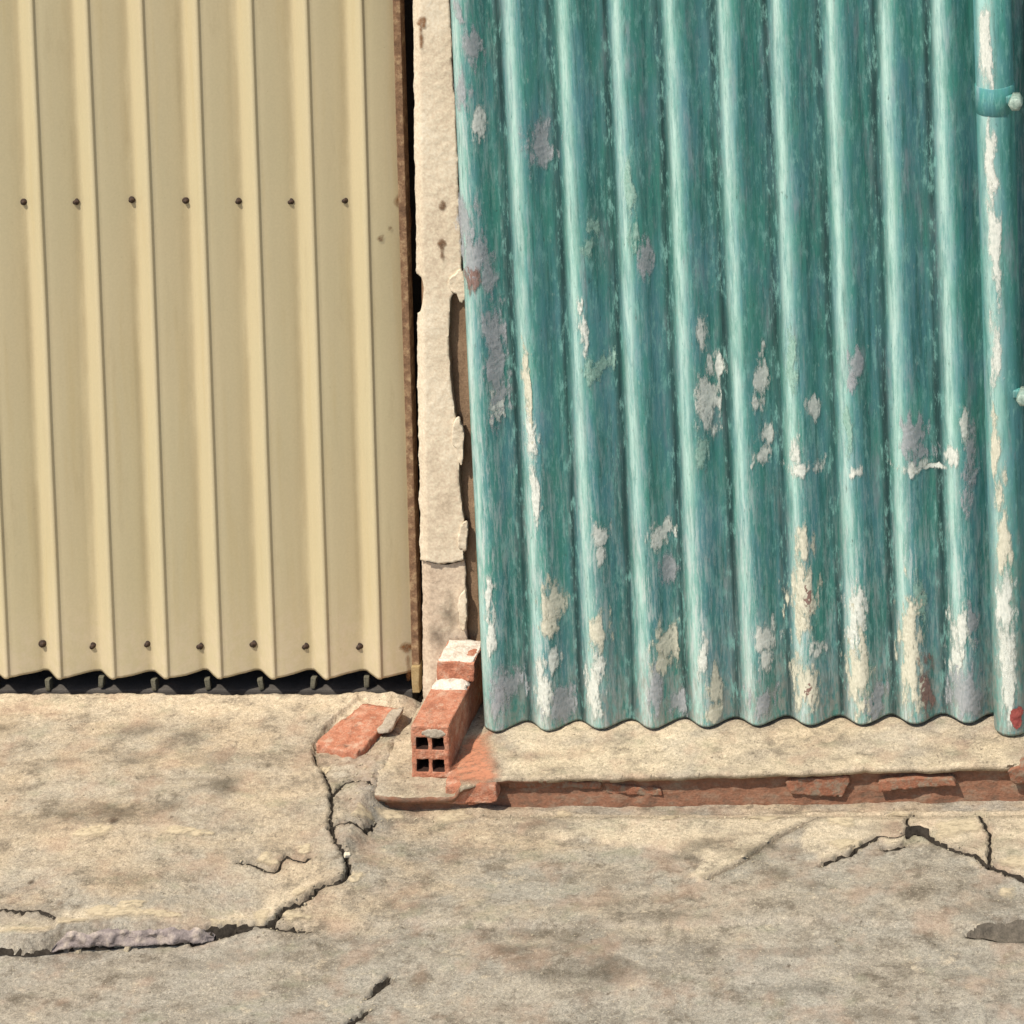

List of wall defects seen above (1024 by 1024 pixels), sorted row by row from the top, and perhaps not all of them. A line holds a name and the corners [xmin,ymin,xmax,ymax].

peeling [979,9,994,90]
peeling [985,118,1002,388]
flaking render [448,195,616,730]
peeling [693,318,724,468]
peeling [750,341,773,469]
crack [232,754,383,936]
peeling [755,523,828,721]
peeling [844,579,888,723]
flaking render [878,773,956,792]
crack [820,811,1024,885]
peeling [890,404,1019,732]
corrosion [1010,706,1024,729]